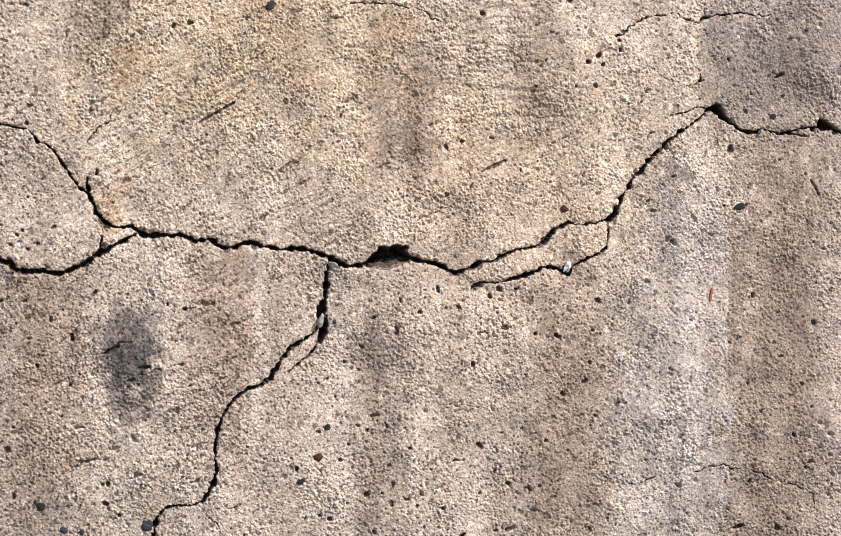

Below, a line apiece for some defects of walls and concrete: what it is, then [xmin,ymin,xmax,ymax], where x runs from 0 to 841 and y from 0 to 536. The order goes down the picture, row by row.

crack [615,12,763,37]
crack [410,106,841,285]
damp [104,314,159,407]
crack [0,123,366,536]
crack [695,463,817,511]